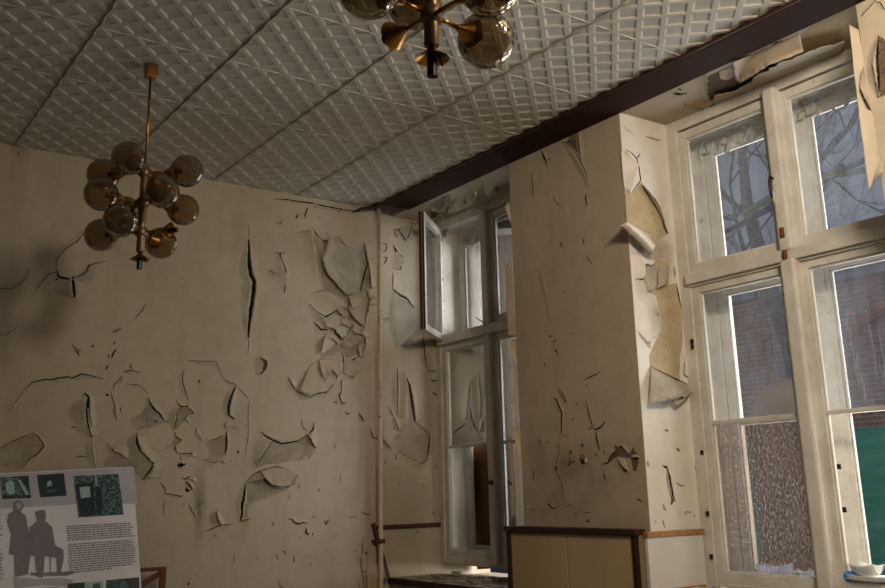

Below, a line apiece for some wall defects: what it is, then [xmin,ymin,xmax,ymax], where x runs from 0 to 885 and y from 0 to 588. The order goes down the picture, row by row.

peeling [684,5,885,189]
peeling [0,432,47,469]
crack [9,303,149,421]
peeling [69,357,232,481]
crack [239,224,265,354]
peeling [245,418,319,505]
crack [276,207,319,225]
peeling [285,214,437,400]
peeling [379,368,432,470]
peeling [429,180,511,238]
crack [530,370,606,523]
peeling [620,149,692,405]